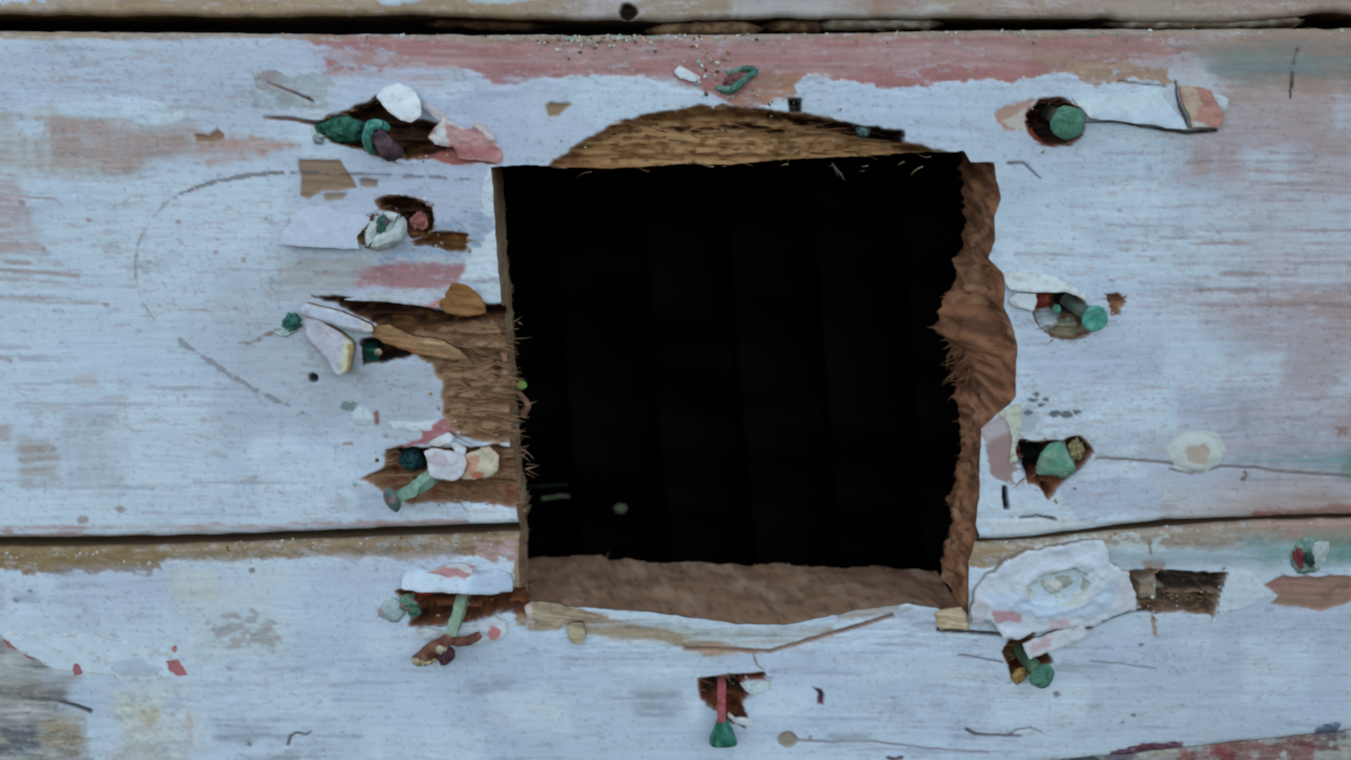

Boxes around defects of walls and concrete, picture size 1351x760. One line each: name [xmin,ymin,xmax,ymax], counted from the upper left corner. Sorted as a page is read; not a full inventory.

spalling [618,3,641,22]
peeling [328,32,1172,163]
peeling [1071,85,1229,129]
peeling [278,159,380,249]
peeling [344,289,446,308]
peeling [997,402,1023,463]
crack [1095,456,1351,484]
peeling [401,562,513,595]
peeling [1,630,187,682]
peeling [415,615,508,647]
crack [684,613,896,672]
peeling [740,680,772,694]